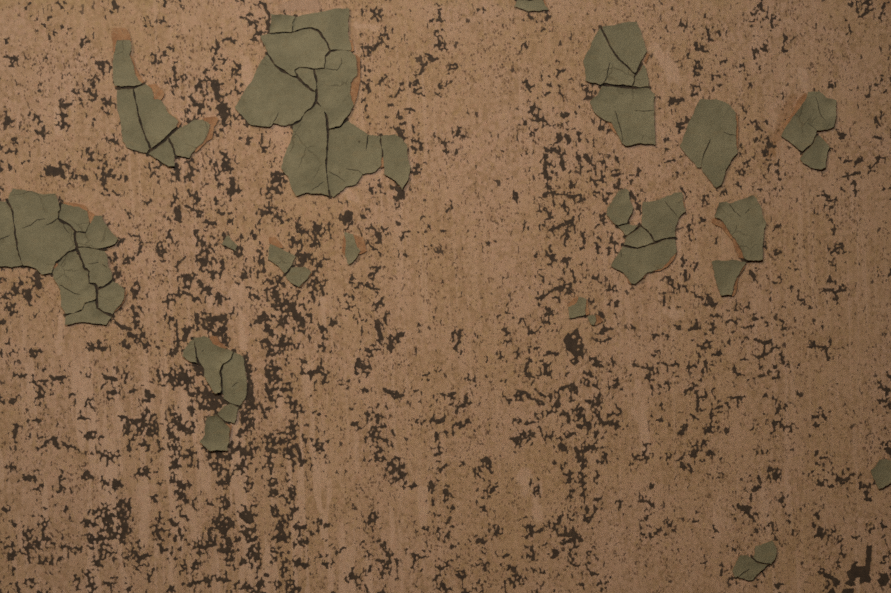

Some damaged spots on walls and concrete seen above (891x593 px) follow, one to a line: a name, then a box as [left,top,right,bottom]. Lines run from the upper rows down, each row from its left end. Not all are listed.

peeling [0,0,448,593]
peeling [344,0,891,593]